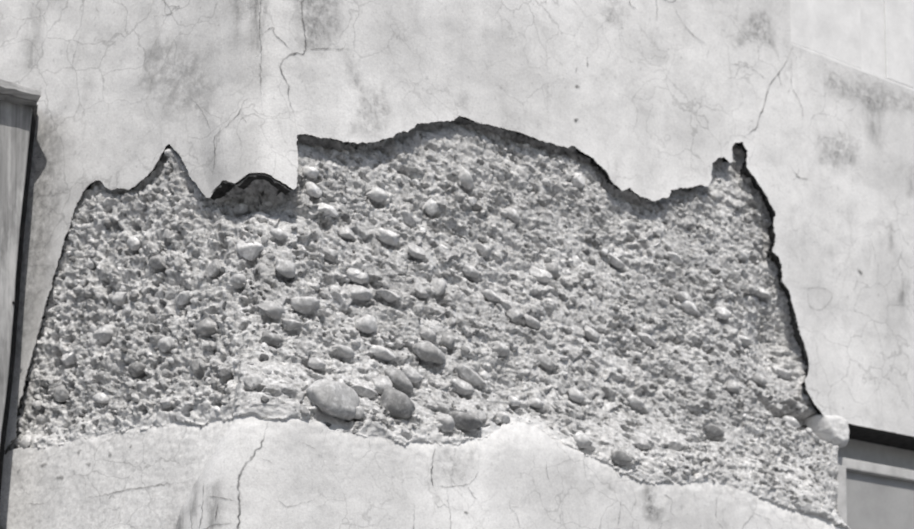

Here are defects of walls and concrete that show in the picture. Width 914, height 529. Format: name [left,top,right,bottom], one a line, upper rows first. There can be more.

spalling [4,116,850,529]